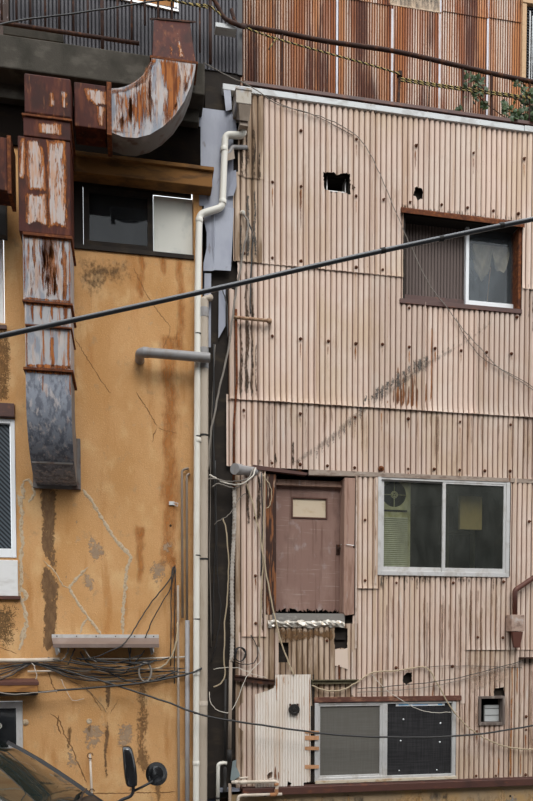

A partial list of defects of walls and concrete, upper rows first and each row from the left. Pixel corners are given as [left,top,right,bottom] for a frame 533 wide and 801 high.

corrosion [84,43,194,133]
corrosion [19,123,68,228]
corrosion [23,236,71,395]
corrosion [382,338,436,408]
water stain [0,602,19,647]
crack [0,479,36,654]
water stain [40,489,59,651]
crack [43,560,101,634]
crack [82,489,133,634]
water stain [136,684,149,772]